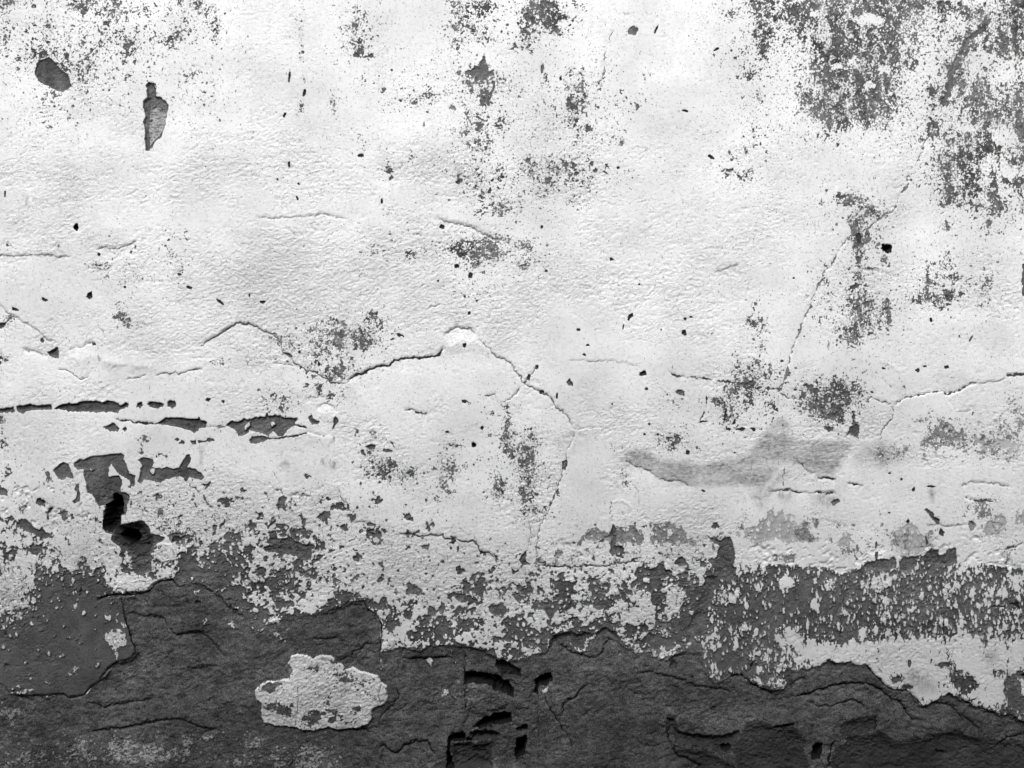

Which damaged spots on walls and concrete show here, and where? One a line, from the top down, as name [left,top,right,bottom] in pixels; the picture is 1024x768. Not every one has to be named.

peeling [0,0,245,151]
peeling [84,229,193,329]
crack [671,24,982,422]
crack [126,321,638,568]
crack [867,373,1024,439]
spalling [0,382,1024,768]